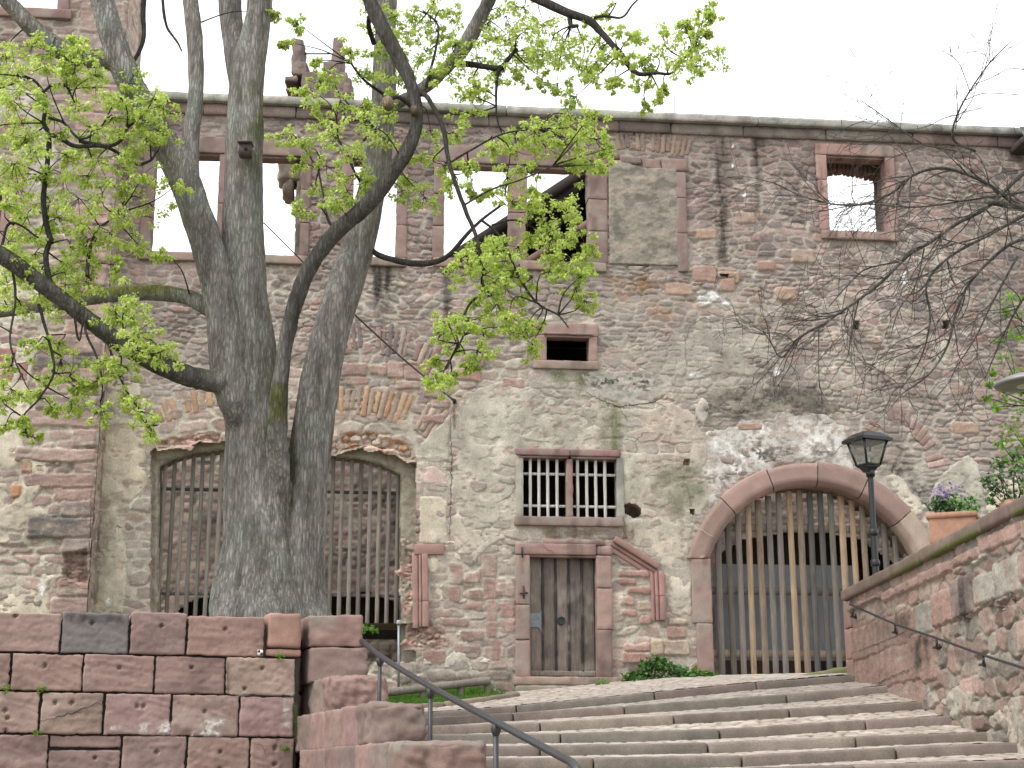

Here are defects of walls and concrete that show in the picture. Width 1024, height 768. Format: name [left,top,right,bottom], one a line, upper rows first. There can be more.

peeling [0,265,59,544]
peeling [47,349,223,614]
peeling [331,319,843,651]
crack [586,392,666,450]